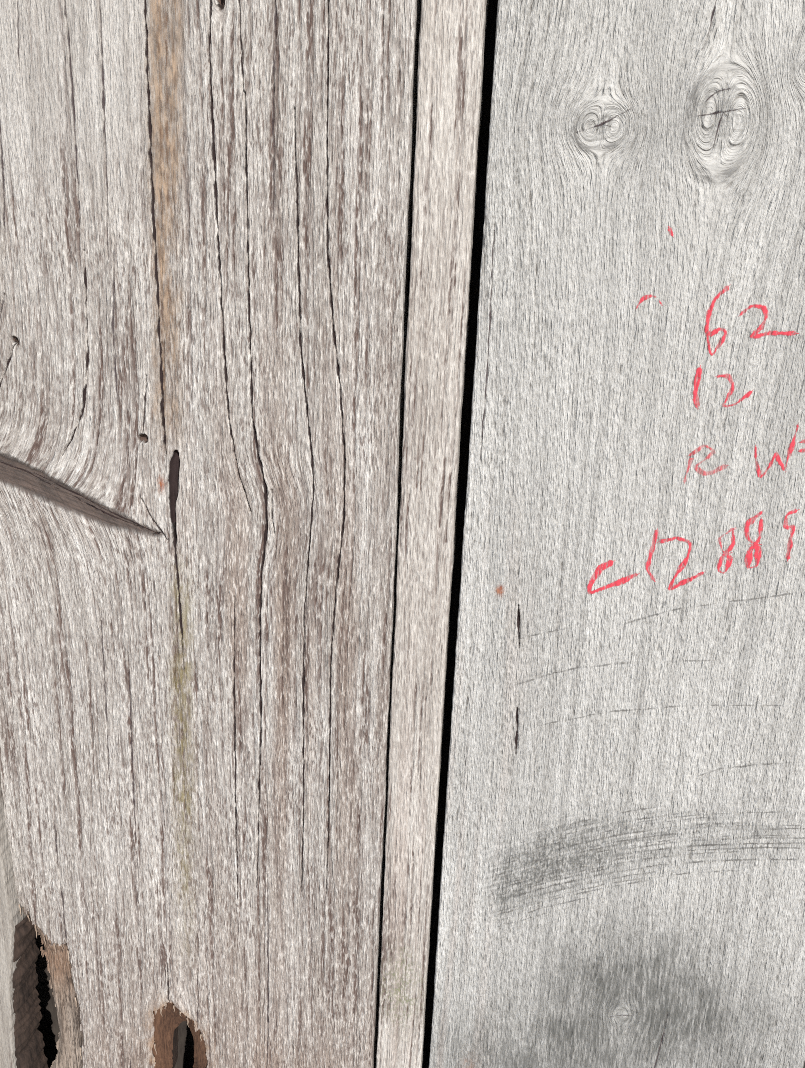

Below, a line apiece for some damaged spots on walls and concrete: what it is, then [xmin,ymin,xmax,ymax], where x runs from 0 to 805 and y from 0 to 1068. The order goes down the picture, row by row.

crack [62,0,184,673]